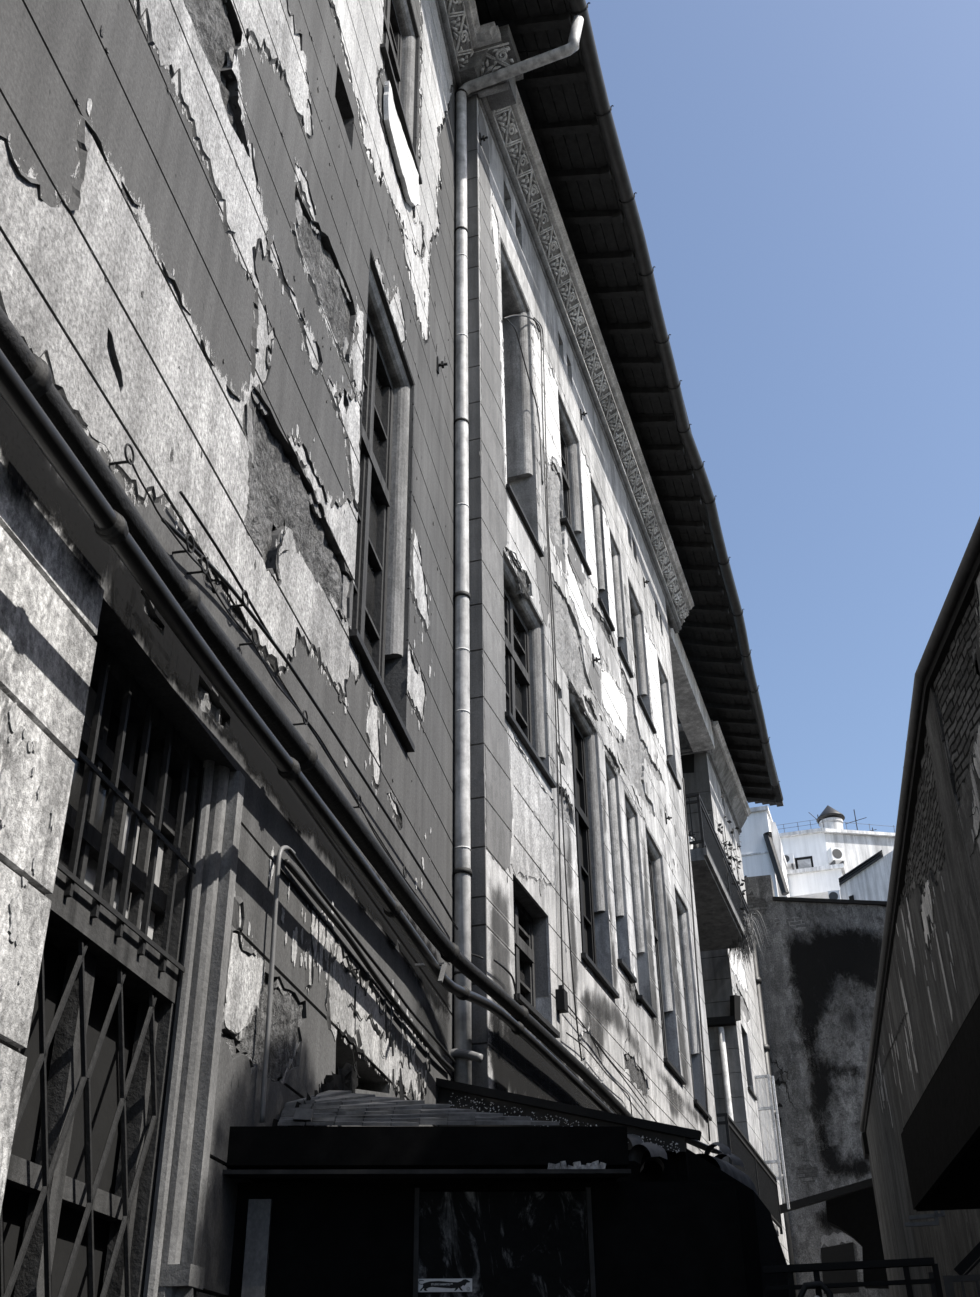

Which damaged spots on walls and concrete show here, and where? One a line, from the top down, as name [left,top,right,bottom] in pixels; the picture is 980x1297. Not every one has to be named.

peeling [332,0,454,362]
peeling [0,0,403,831]
peeling [407,524,439,732]
peeling [222,882,431,1100]